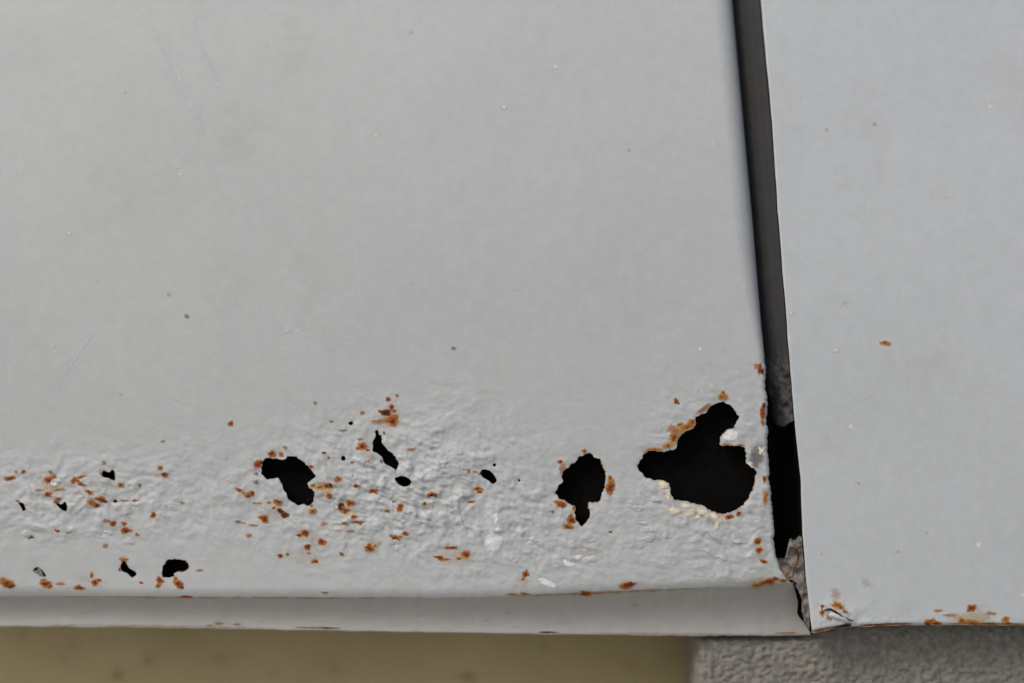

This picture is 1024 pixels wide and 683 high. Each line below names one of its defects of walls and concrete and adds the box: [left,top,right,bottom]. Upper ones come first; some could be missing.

corrosion [329,394,403,464]
corrosion [643,390,728,454]
peeling [722,429,740,441]
peeling [747,443,765,468]
corrosion [35,461,144,543]
corrosion [234,485,290,538]
corrosion [277,451,378,569]
peeling [658,481,723,529]
corrosion [360,531,409,556]
corrosion [432,546,476,569]
corrosion [0,571,17,593]
corrosion [812,588,1024,632]